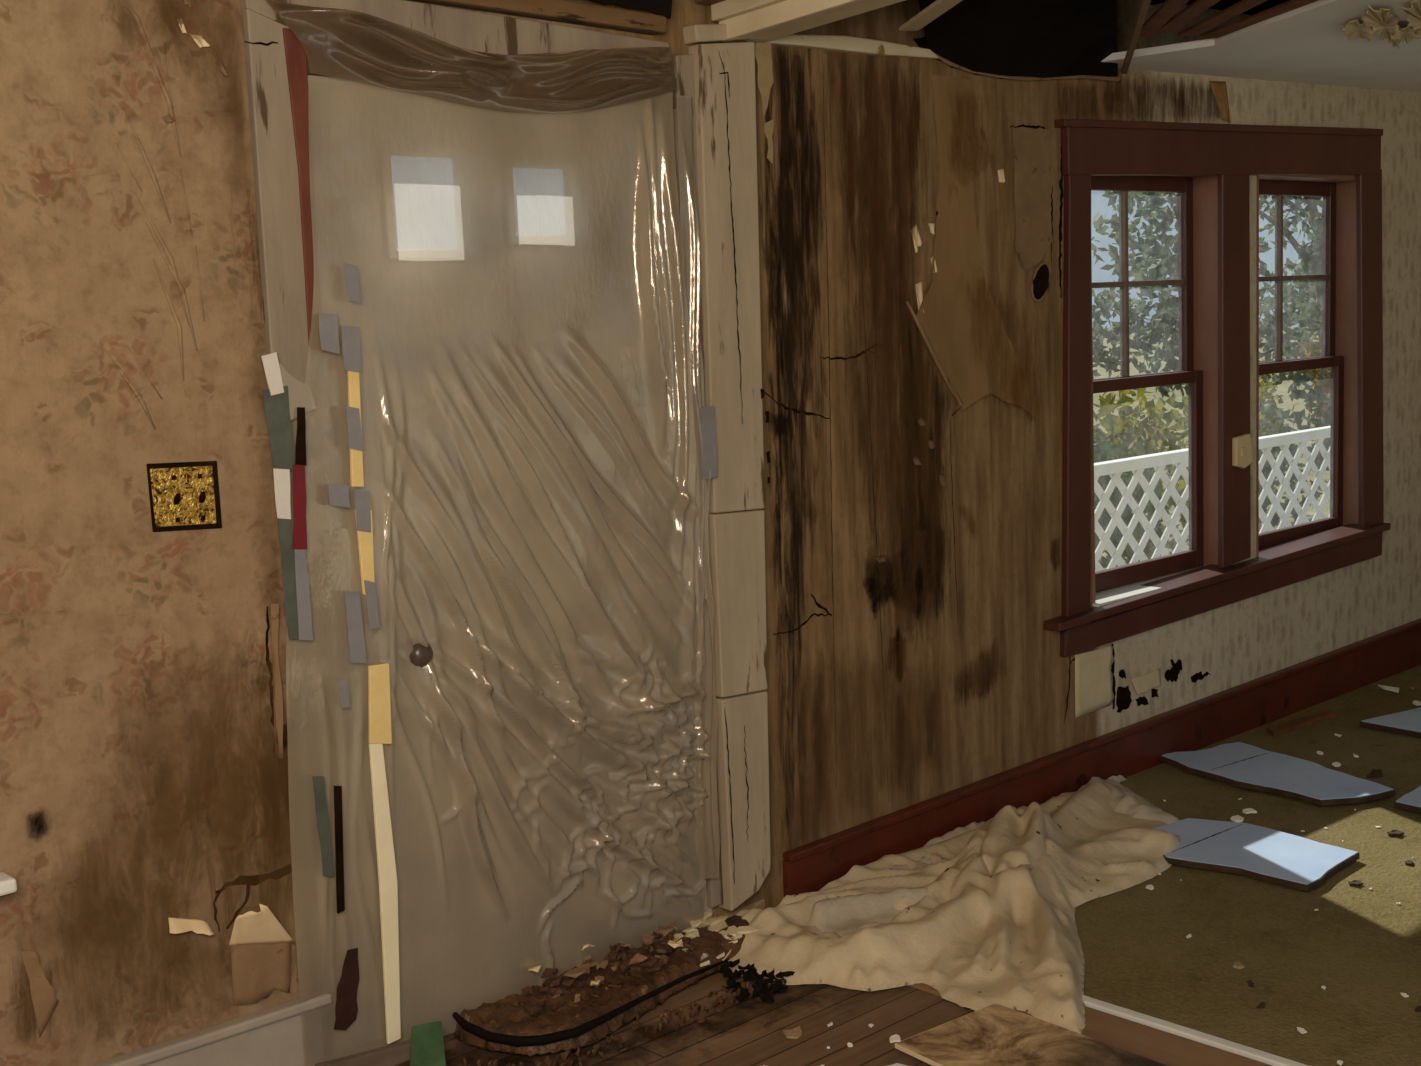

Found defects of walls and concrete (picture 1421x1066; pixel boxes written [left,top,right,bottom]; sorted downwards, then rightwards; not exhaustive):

damp [829,54,951,680]
damp [766,46,824,828]
damp [29,813,47,836]
damp [274,725,289,831]
damp [21,970,35,1035]